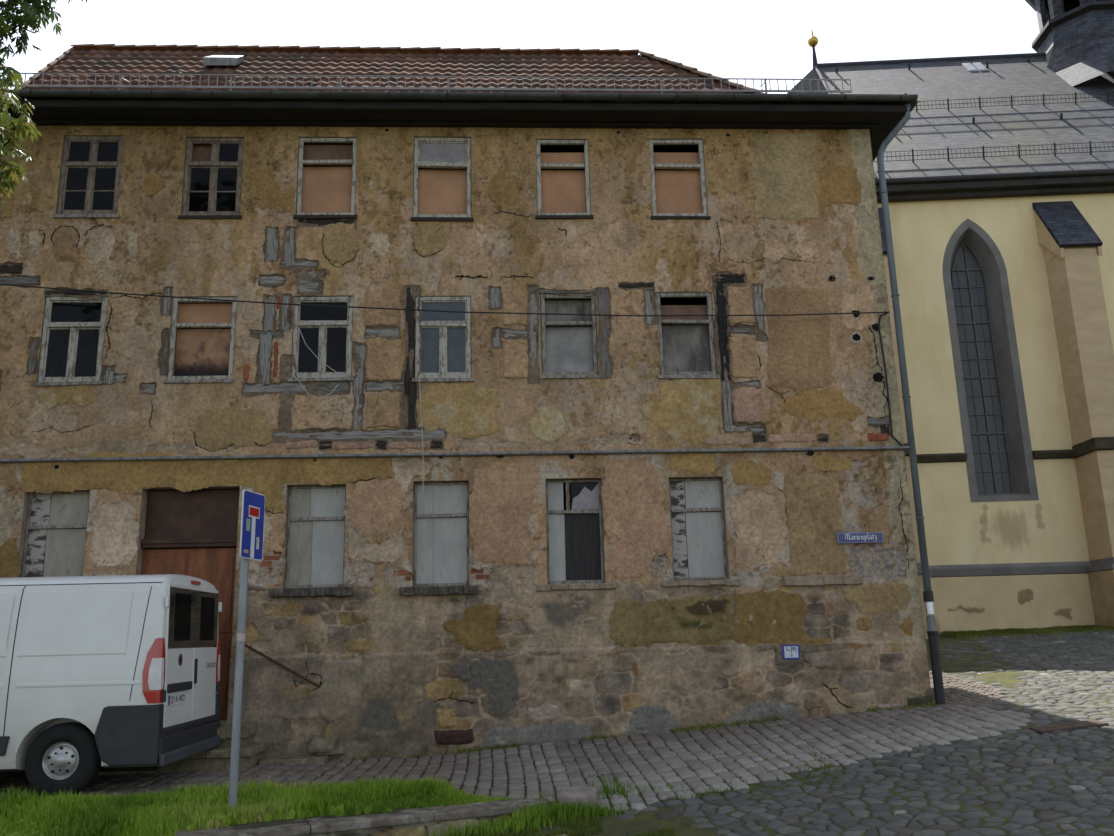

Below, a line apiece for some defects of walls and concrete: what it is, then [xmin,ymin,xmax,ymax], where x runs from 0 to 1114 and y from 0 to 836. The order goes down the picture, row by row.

spalling [0,225,108,299]
peeling [20,214,447,586]
spalling [488,282,658,384]
spalling [704,222,829,446]
spalling [840,284,878,330]
crack [868,325,888,415]
spalling [867,416,891,442]
crack [899,476,910,571]
leakage [672,599,727,615]
spalling [1018,589,1033,604]
crack [822,682,854,708]